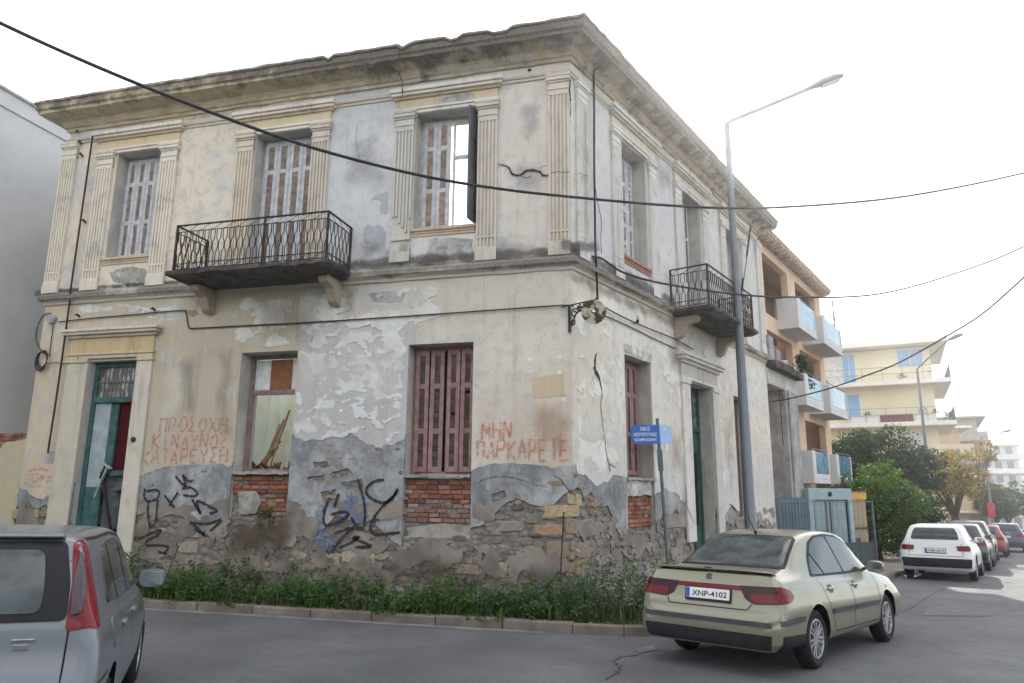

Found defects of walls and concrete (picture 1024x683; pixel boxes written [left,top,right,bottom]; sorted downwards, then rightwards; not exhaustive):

crack [498,163,587,178]
flaking render [136,286,730,604]
crack [593,354,616,471]
peeling [16,485,49,525]